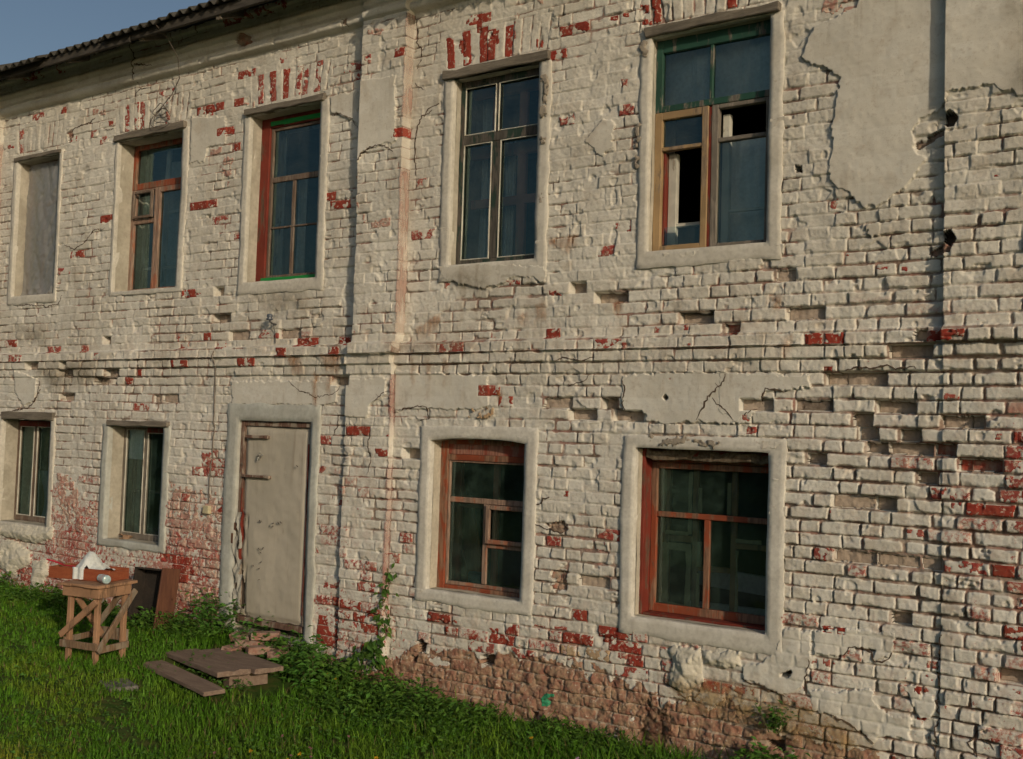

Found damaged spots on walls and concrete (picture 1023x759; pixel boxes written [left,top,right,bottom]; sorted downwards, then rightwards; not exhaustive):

peeling [446,12,518,69]
crack [356,28,439,179]
peeling [804,332,845,346]
spalling [889,328,965,358]
peeling [543,371,833,450]
crack [696,376,787,420]
spalling [824,366,888,386]
spalling [853,400,1023,534]
peeling [160,484,223,622]
spalling [814,548,1023,609]
spalling [353,611,937,759]
crack [840,646,892,663]